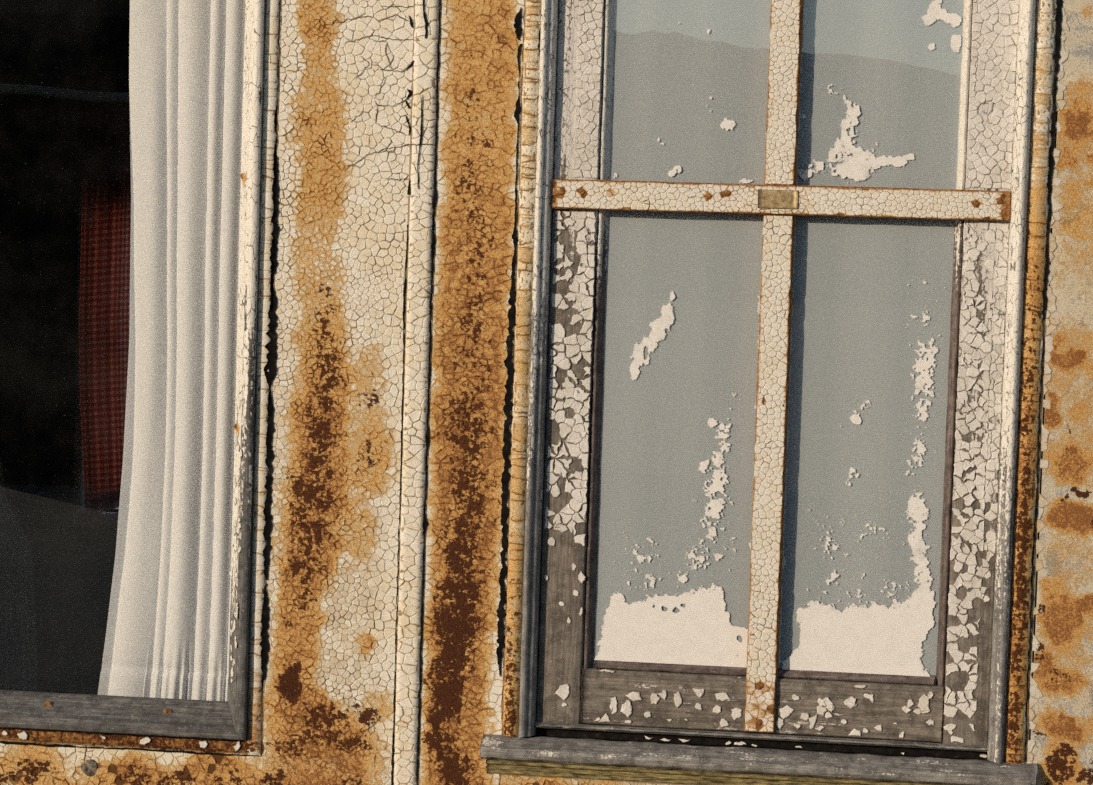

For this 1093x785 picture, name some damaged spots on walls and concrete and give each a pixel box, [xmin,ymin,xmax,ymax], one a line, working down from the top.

crack [0,728,259,757]
corrosion [0,0,399,785]
crack [260,0,301,693]
crack [336,0,441,785]
corrosion [418,0,624,785]
peeling [545,210,596,546]
peeling [559,563,586,624]
peeling [595,690,682,723]
peeling [693,688,742,727]
peeling [776,222,1009,743]
crack [1024,0,1062,762]
corrosion [1005,12,1093,785]